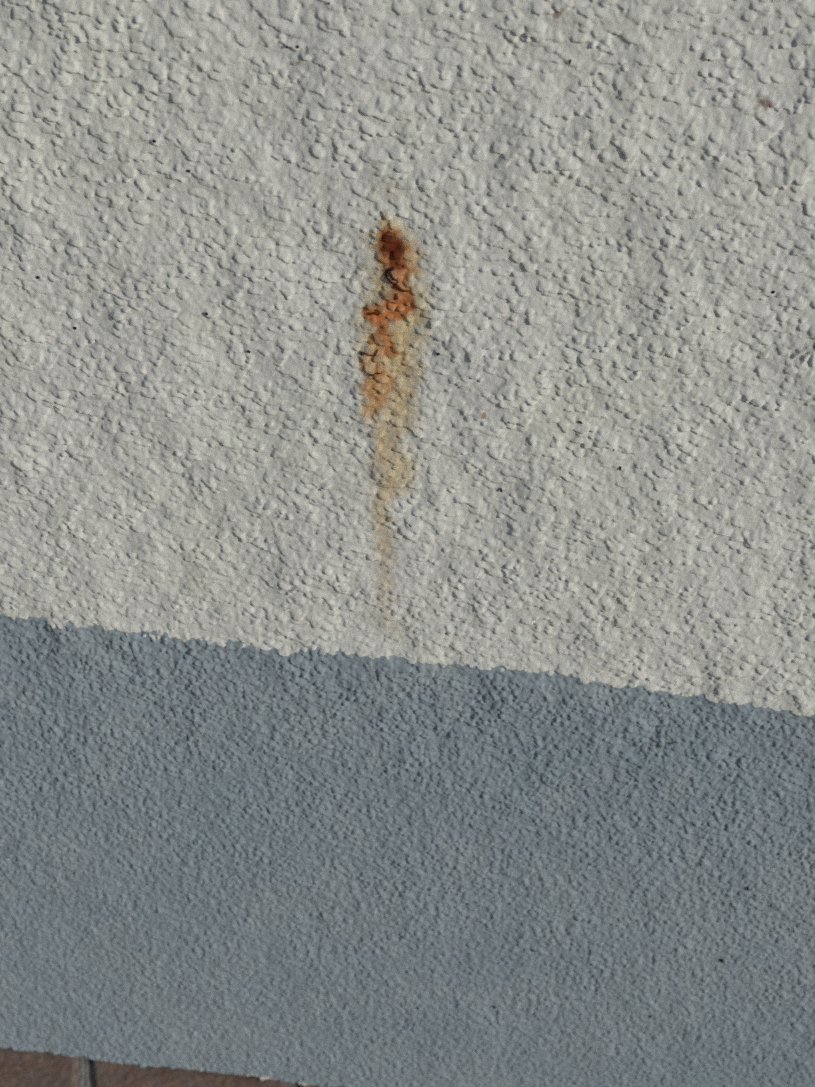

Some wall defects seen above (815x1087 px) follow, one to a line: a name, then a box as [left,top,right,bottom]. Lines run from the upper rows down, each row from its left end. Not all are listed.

corrosion [360,217,423,500]